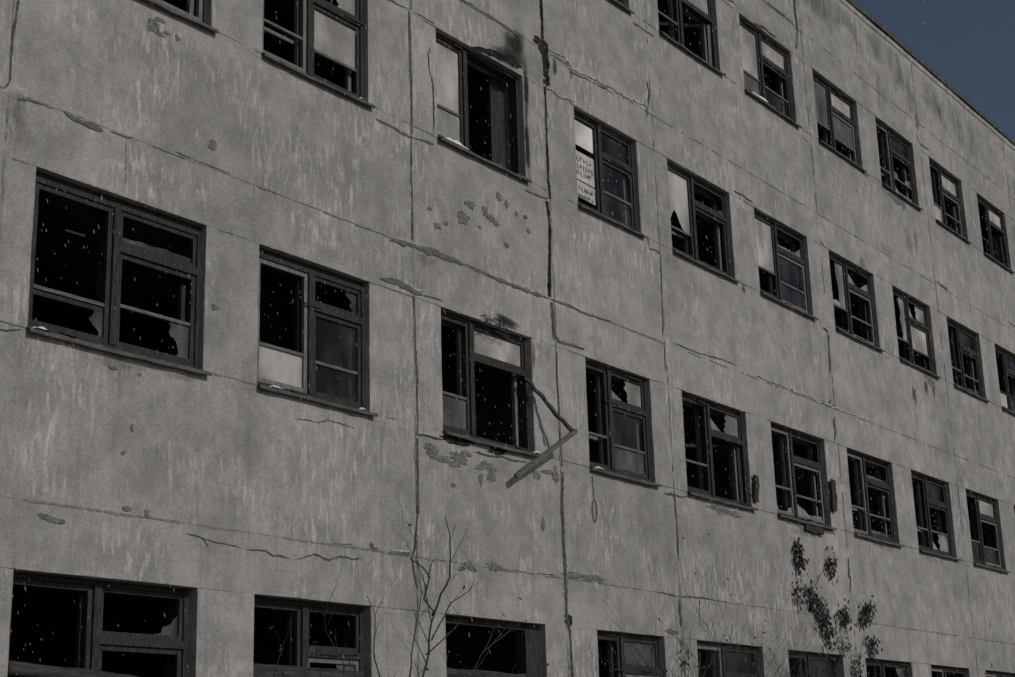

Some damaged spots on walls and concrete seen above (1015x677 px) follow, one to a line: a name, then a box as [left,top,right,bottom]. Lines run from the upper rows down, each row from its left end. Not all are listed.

crack [391,0,435,134]
spalling [434,200,500,230]
spalling [496,191,530,234]
spalling [418,432,507,520]
crack [187,533,361,561]